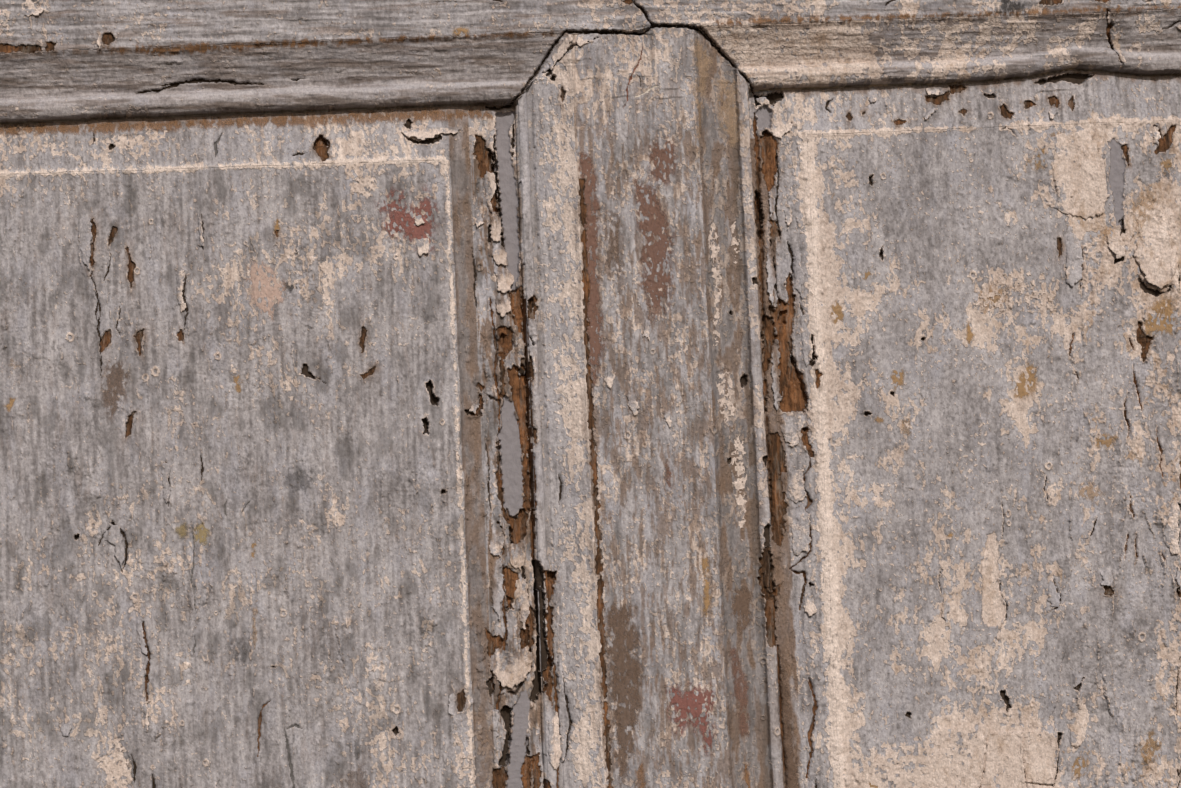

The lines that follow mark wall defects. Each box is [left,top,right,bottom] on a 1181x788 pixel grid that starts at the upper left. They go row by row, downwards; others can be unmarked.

crack [485,0,754,110]
peeling [924,85,967,120]
peeling [984,93,1035,133]
spalling [1034,73,1094,119]
peeling [1036,125,1177,297]
peeling [708,221,741,346]
peeling [1129,321,1153,411]
peeling [458,111,562,788]
peeling [727,435,747,541]
peeling [752,92,823,788]
crack [780,456,813,610]
crack [804,678,818,788]